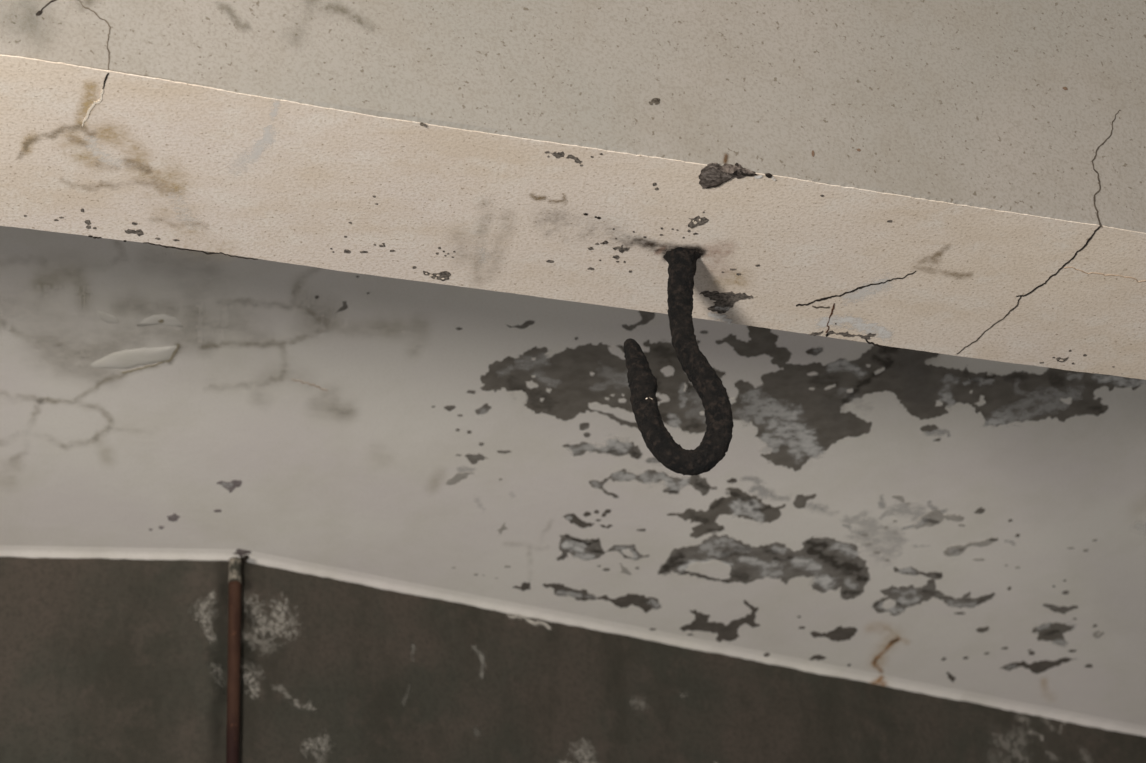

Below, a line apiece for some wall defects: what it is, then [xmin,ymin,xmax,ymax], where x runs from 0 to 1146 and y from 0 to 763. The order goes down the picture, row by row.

crack [24,0,111,151]
spalling [698,155,776,189]
crack [957,110,1146,354]
peeling [622,310,655,331]
crack [796,253,941,339]
peeling [696,291,1146,471]
peeling [432,337,1011,616]
leakage [244,595,296,641]
peeling [680,599,760,642]
peeling [797,616,858,642]
peeling [1000,579,1092,674]